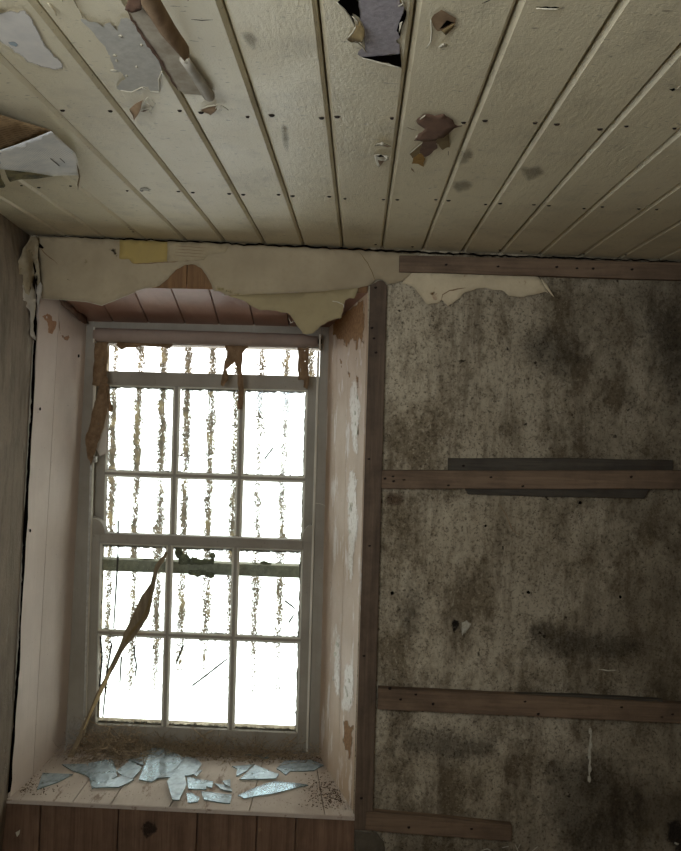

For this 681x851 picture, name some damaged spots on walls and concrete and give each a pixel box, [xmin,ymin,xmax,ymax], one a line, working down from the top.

peeling [0,11,62,69]
peeling [81,0,228,120]
peeling [407,114,461,172]
peeling [333,300,365,349]
peeling [340,359,361,454]
peeling [347,471,359,580]
peeling [333,624,354,759]